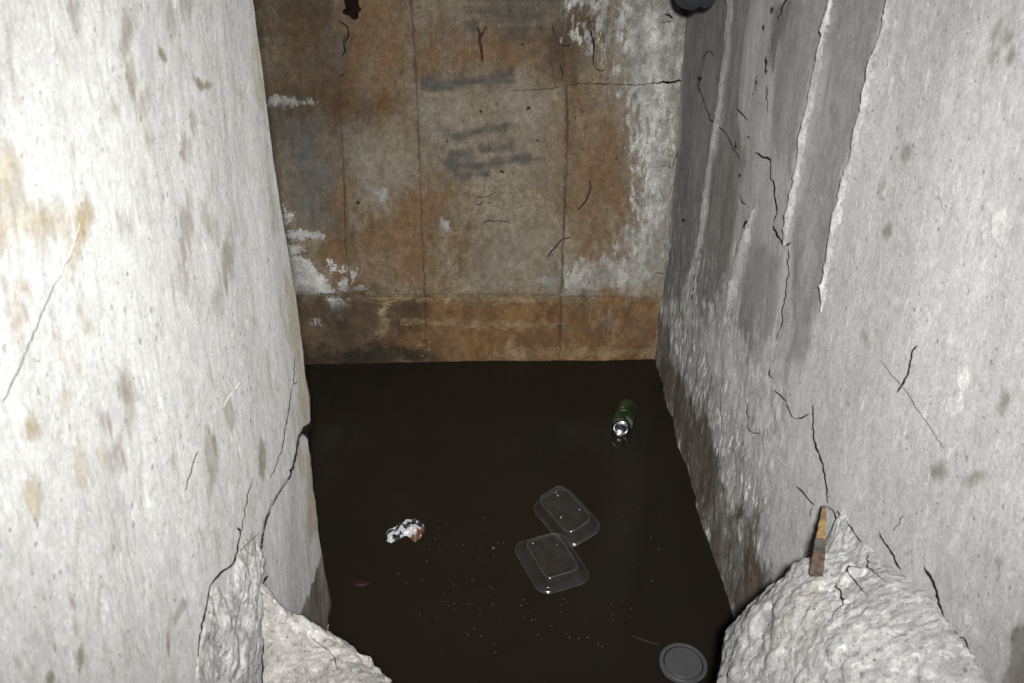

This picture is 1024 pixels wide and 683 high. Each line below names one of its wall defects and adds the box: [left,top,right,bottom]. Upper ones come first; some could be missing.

damp [268,94,314,106]
damp [298,0,771,631]
crack [512,0,791,342]
crack [198,359,307,656]
crack [258,636,266,683]
crack [768,370,986,680]